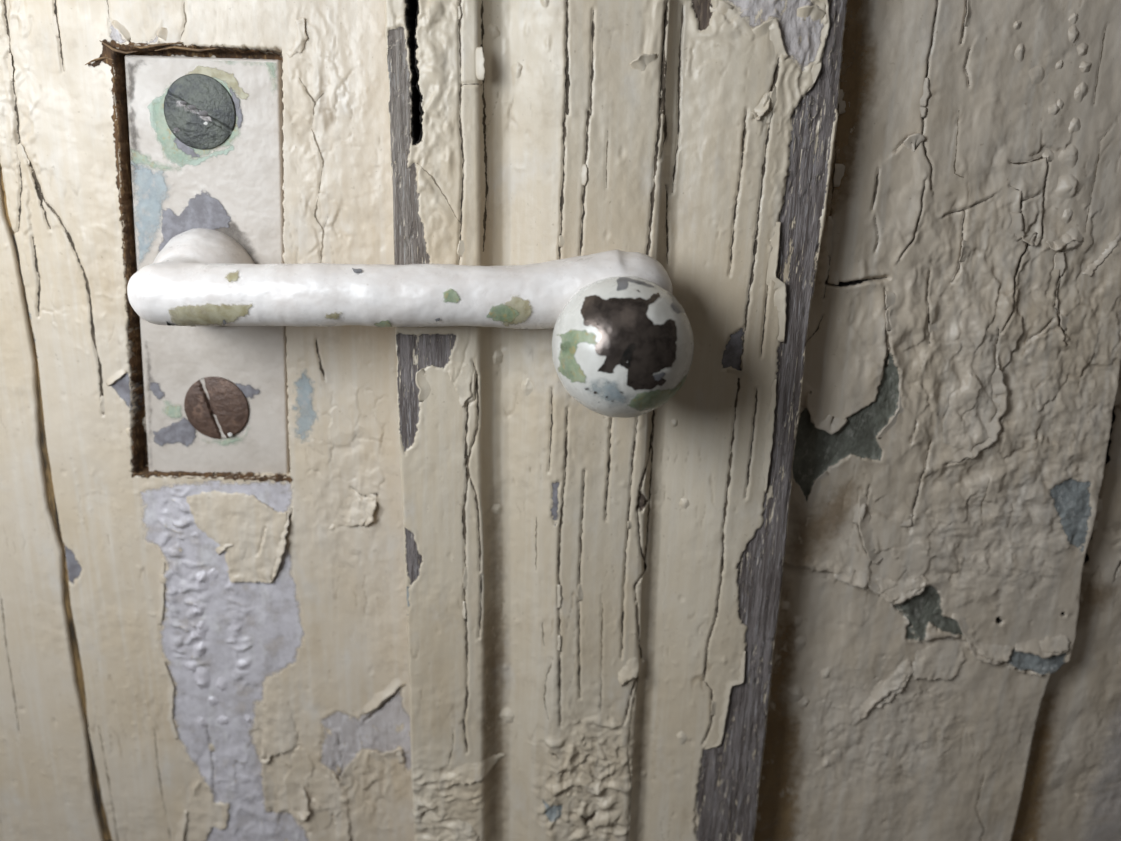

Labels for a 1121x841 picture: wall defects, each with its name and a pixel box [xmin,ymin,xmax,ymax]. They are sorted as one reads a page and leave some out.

peeling [387,27,430,265]
crack [558,0,608,259]
crack [646,0,683,264]
crack [806,89,896,367]
crack [900,0,1069,344]
crack [0,0,118,841]
peeling [396,333,456,451]
peeling [691,0,904,841]
peeling [141,480,316,841]
peeling [320,678,411,787]
crack [535,391,655,841]
peeling [834,496,1069,675]